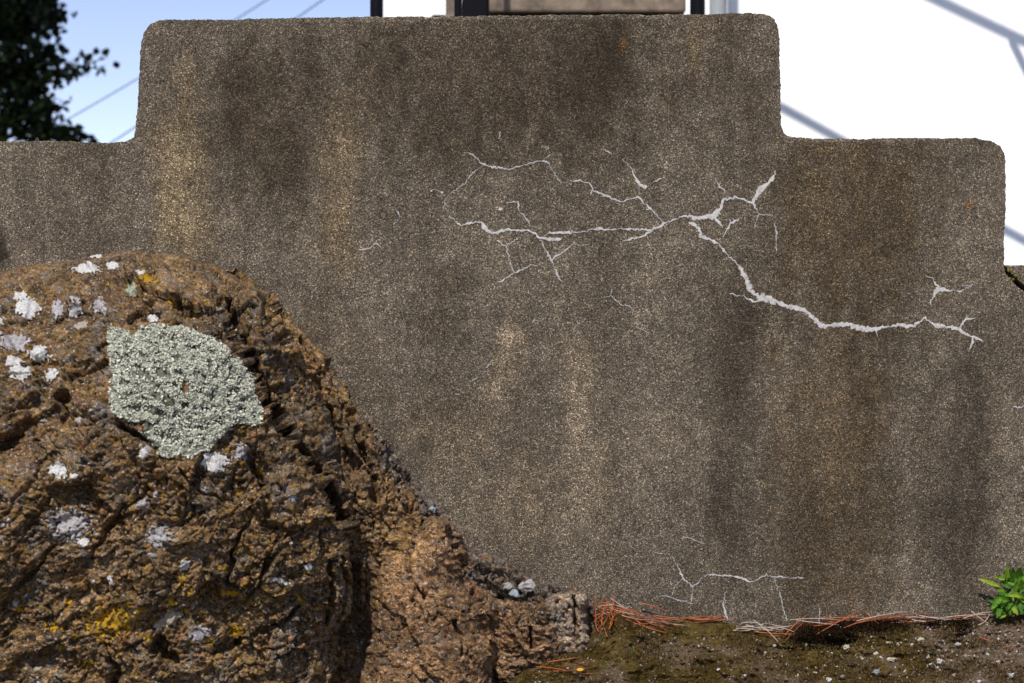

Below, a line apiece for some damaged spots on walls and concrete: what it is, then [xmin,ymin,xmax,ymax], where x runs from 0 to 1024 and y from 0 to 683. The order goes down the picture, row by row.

crack [430,147,983,351]
crack [655,537,803,621]